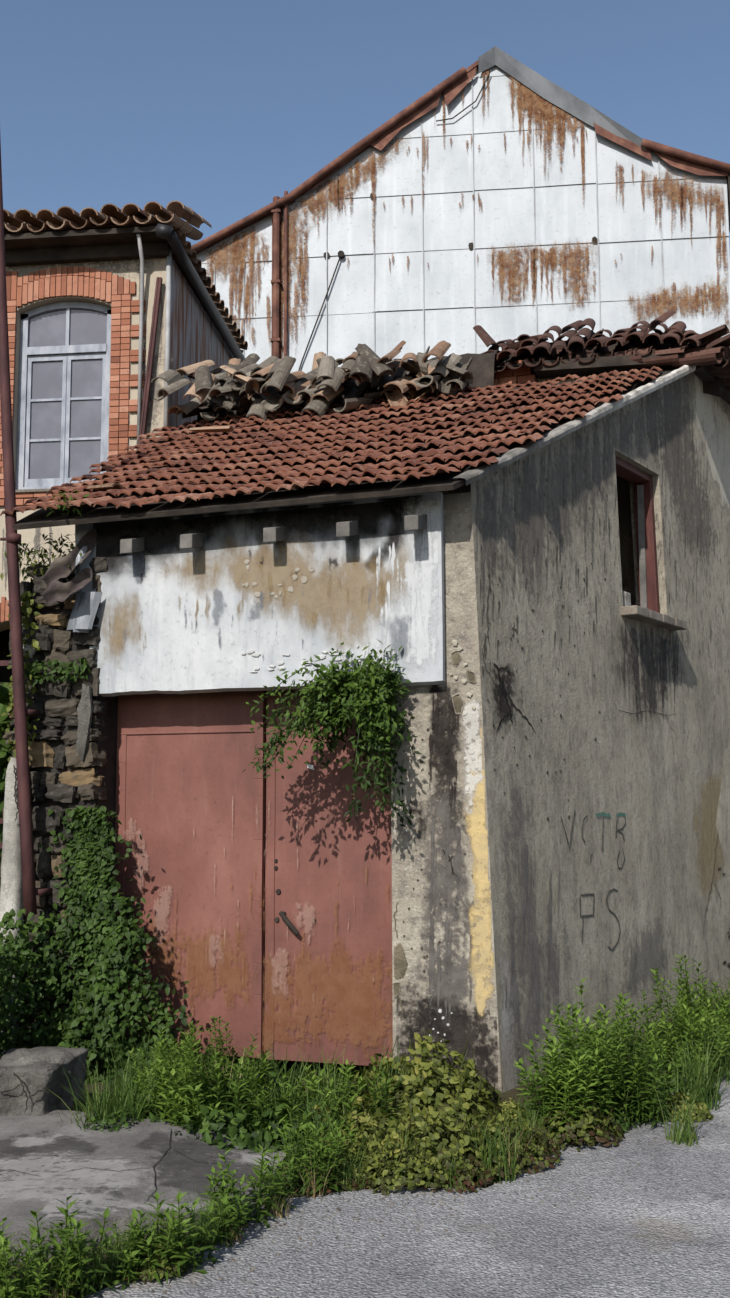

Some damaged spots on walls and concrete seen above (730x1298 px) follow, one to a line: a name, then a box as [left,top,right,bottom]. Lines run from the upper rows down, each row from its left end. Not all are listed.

corrosion [504,77,587,196]
corrosion [206,88,480,348]
corrosion [477,242,596,305]
corrosion [615,163,730,331]
peeling [242,559,314,598]
water stain [476,375,730,727]
peeling [241,650,367,673]
water stain [397,685,566,1084]
peeling [446,640,531,1016]
spalling [393,902,441,1027]
crack [3,1130,218,1201]